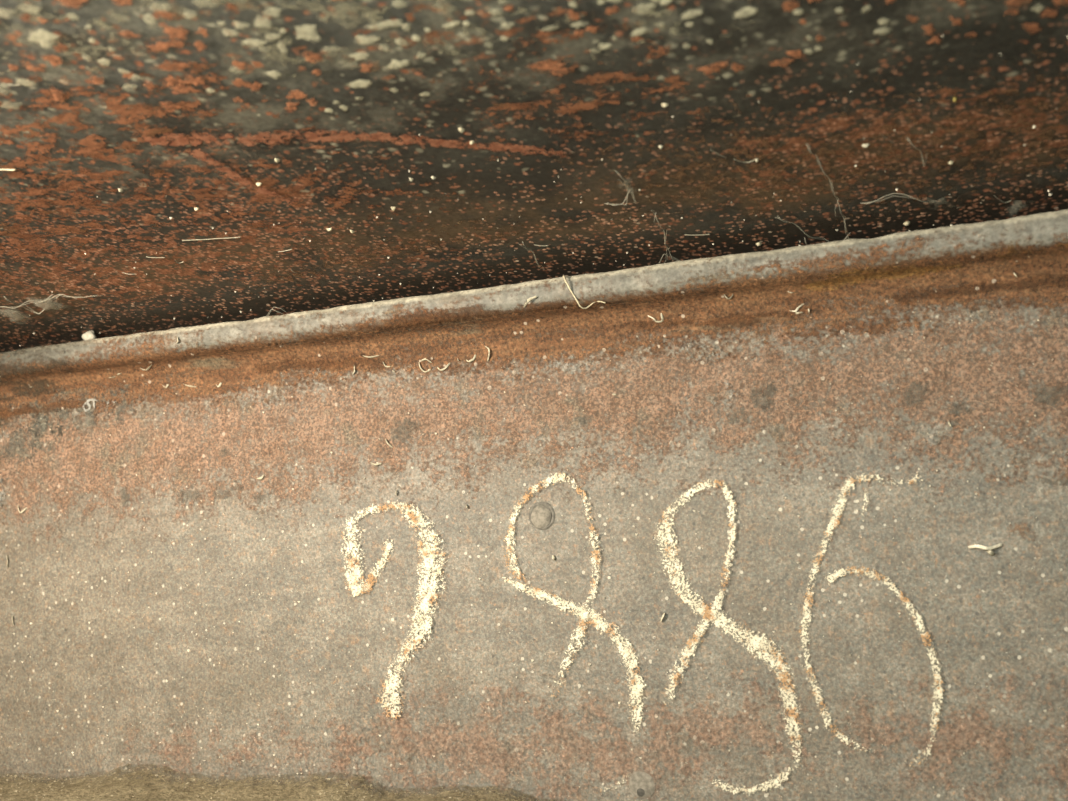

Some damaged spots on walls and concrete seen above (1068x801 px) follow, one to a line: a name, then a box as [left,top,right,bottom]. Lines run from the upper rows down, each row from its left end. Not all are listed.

rust [56,0,87,9]
rust [782,0,819,25]
rust [907,16,940,44]
rust [1004,0,1068,34]
rust [697,61,745,75]
rust [769,50,802,67]
rust [0,6,696,285]
rust [0,233,1068,545]